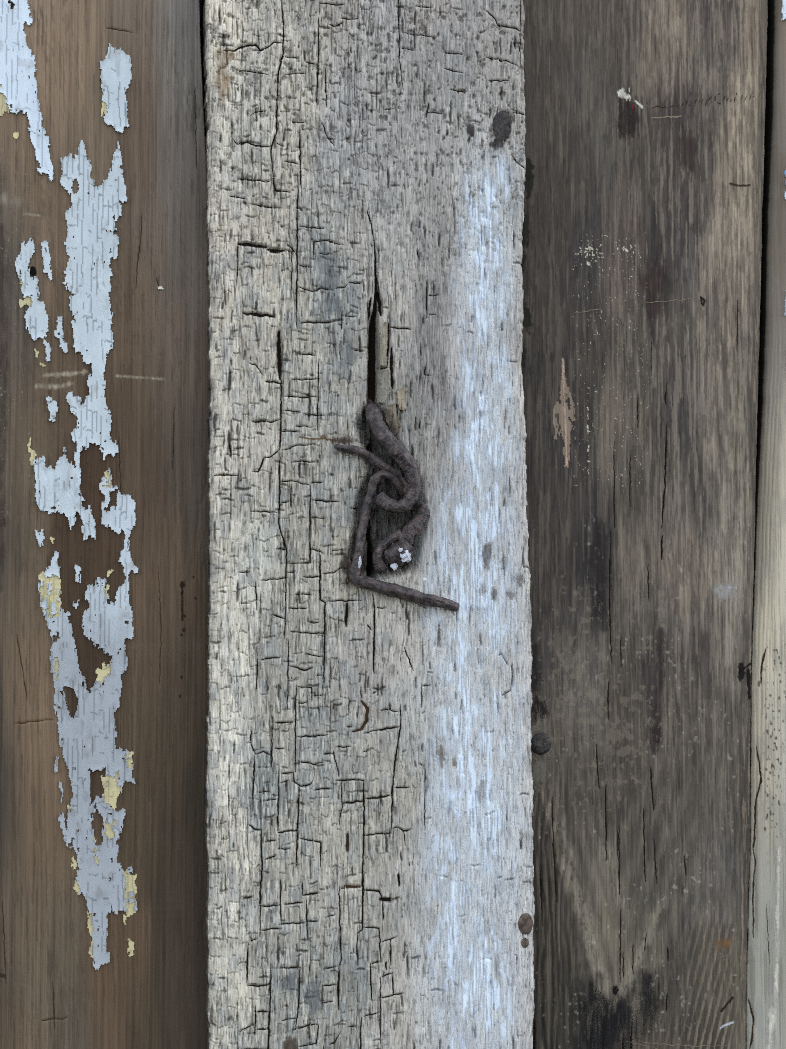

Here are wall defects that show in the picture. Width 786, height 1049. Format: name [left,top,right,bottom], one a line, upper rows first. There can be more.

crack [385,0,521,110]
crack [192,87,200,165]
peeling [0,0,138,970]
crack [214,3,437,1049]
corrosion [341,551,352,585]